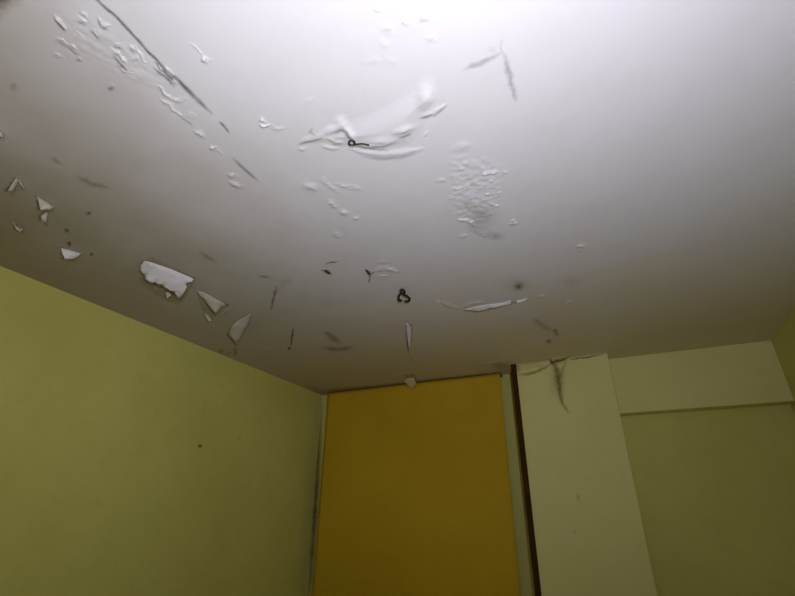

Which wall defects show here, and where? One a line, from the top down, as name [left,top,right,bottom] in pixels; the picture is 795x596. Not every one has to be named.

crack [103,5,203,105]
peeling [36,197,55,222]
peeling [61,248,81,260]
peeling [141,260,227,321]
peeling [464,298,528,312]